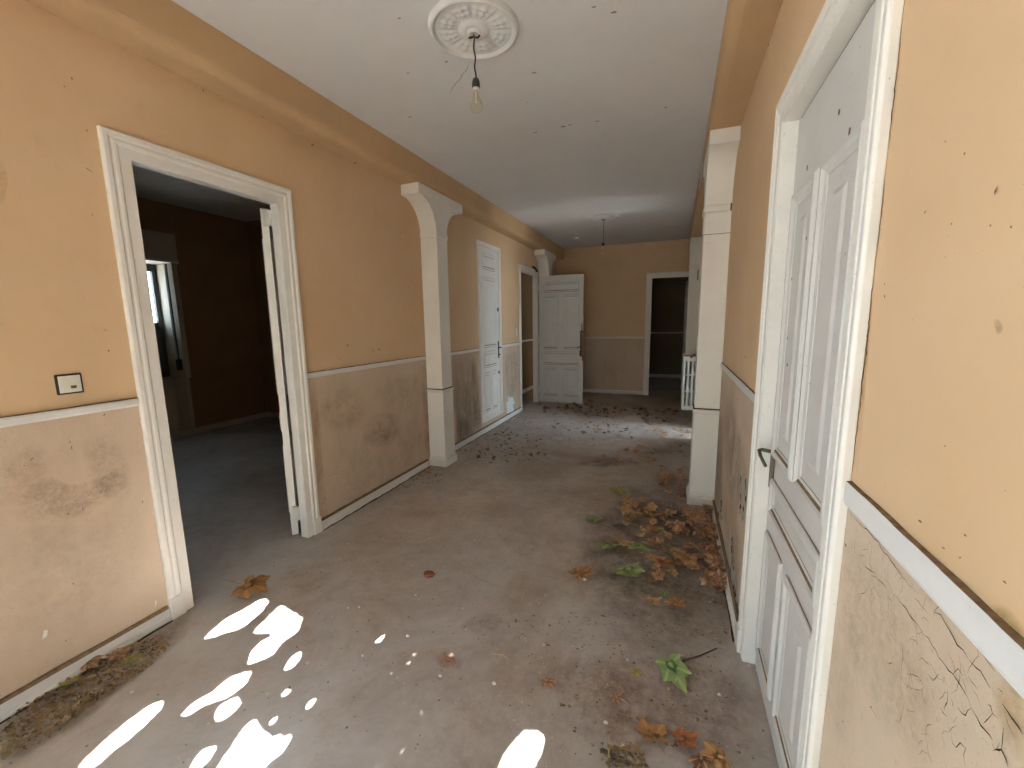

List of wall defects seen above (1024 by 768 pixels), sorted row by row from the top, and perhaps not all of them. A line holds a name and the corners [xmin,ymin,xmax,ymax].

crack [849,511,1022,766]